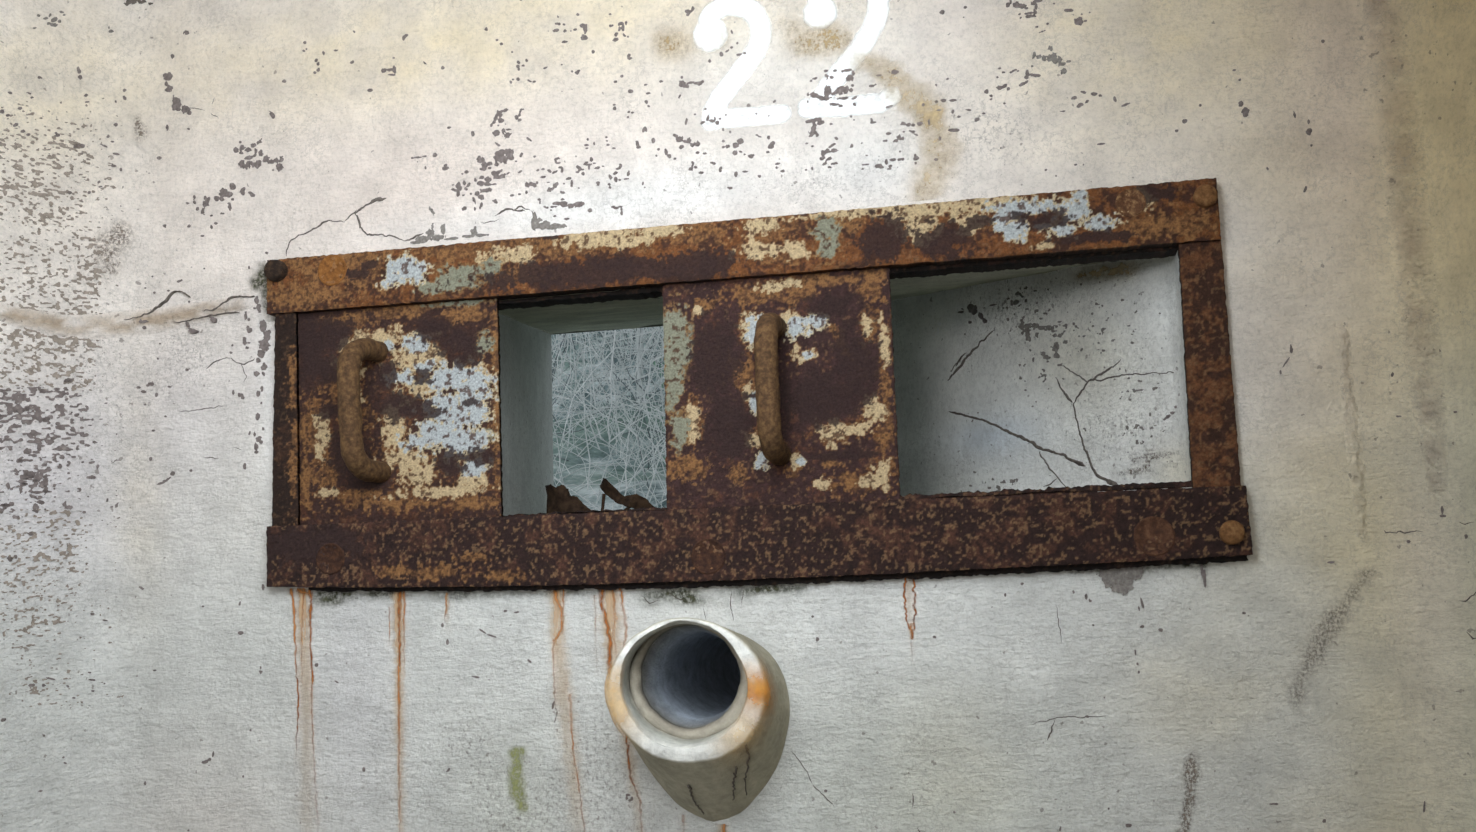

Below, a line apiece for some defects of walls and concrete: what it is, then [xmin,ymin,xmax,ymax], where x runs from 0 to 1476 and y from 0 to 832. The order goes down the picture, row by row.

crack [286,197,424,256]
crack [482,206,534,223]
peeling [410,108,646,244]
peeling [609,13,785,190]
leakage [795,29,845,52]
peeling [805,0,1090,171]
crack [124,290,255,323]
peeling [0,66,126,708]
rust [290,588,314,742]
rust [389,591,405,747]
rust [553,589,564,641]
rust [600,588,635,787]